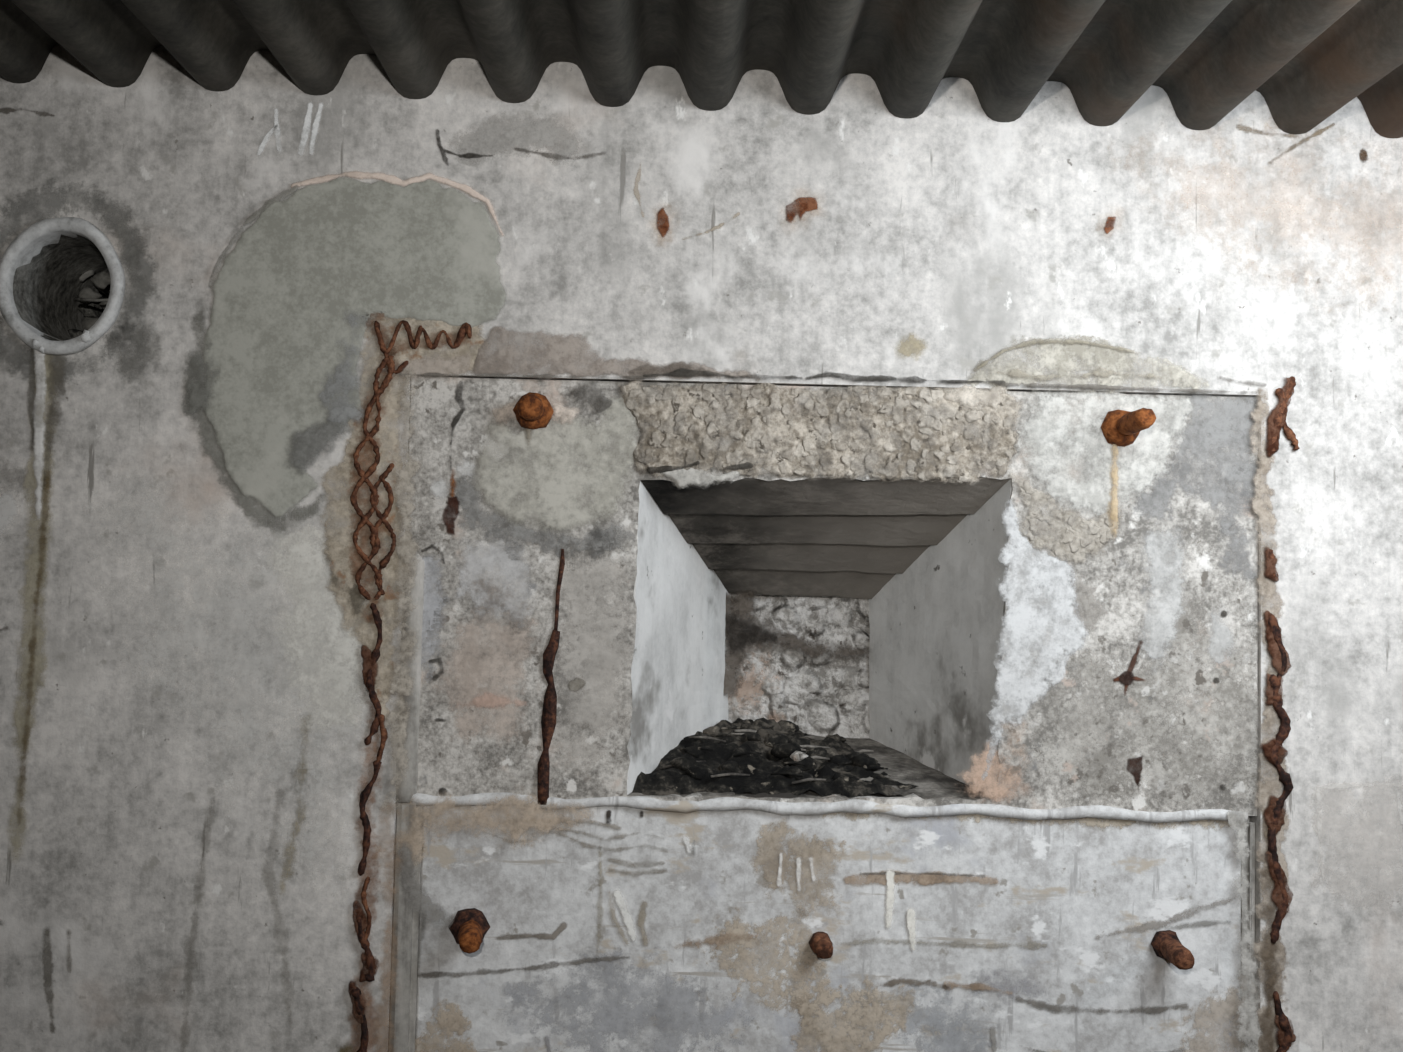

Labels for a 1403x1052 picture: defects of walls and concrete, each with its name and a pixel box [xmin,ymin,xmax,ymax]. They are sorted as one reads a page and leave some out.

corrosion [657,208,669,237]
corrosion [786,197,818,222]
corrosion [1266,378,1296,457]
damp [0,179,160,851]
corrosion [443,474,459,534]
spalling [323,312,1022,863]
corrosion [1264,547,1279,582]
damp [123,505,362,889]
spalling [957,389,1289,1052]
spalling [609,890,648,946]
peeling [683,821,998,1052]
peeling [416,1003,477,1052]